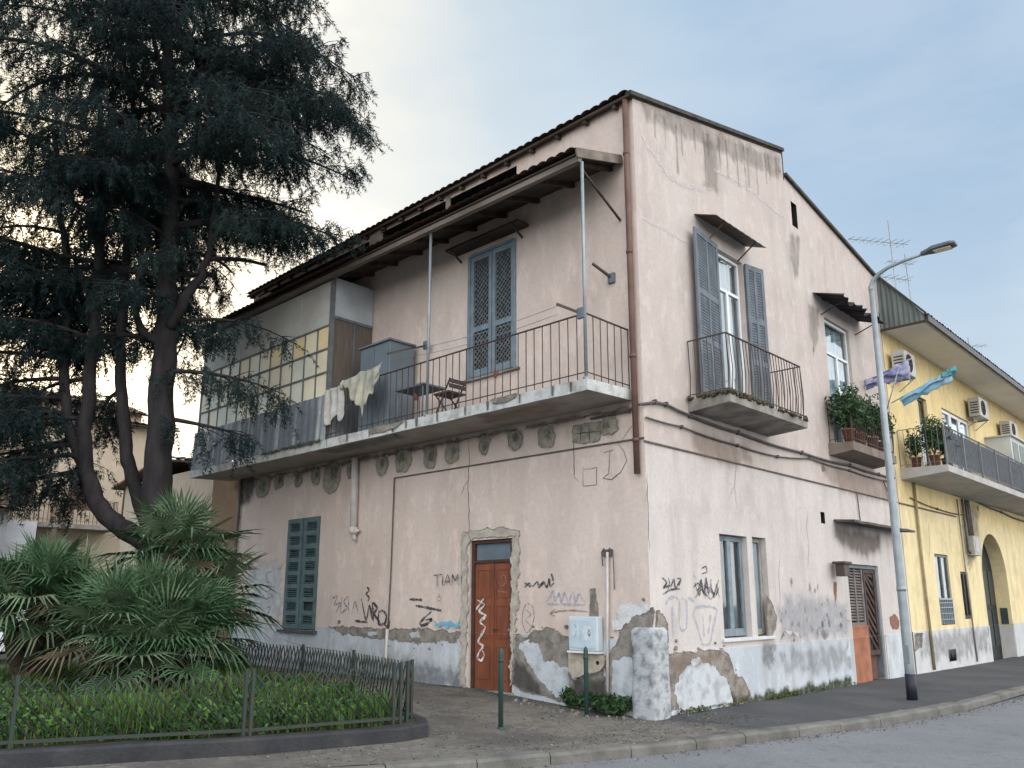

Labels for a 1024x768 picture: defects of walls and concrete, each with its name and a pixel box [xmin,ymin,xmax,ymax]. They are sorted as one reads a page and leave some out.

spalling [479,433,491,455]
spalling [507,430,523,451]
spalling [537,425,556,448]
spalling [572,416,619,444]
spalling [376,443,460,476]
flaking render [328,526,751,712]